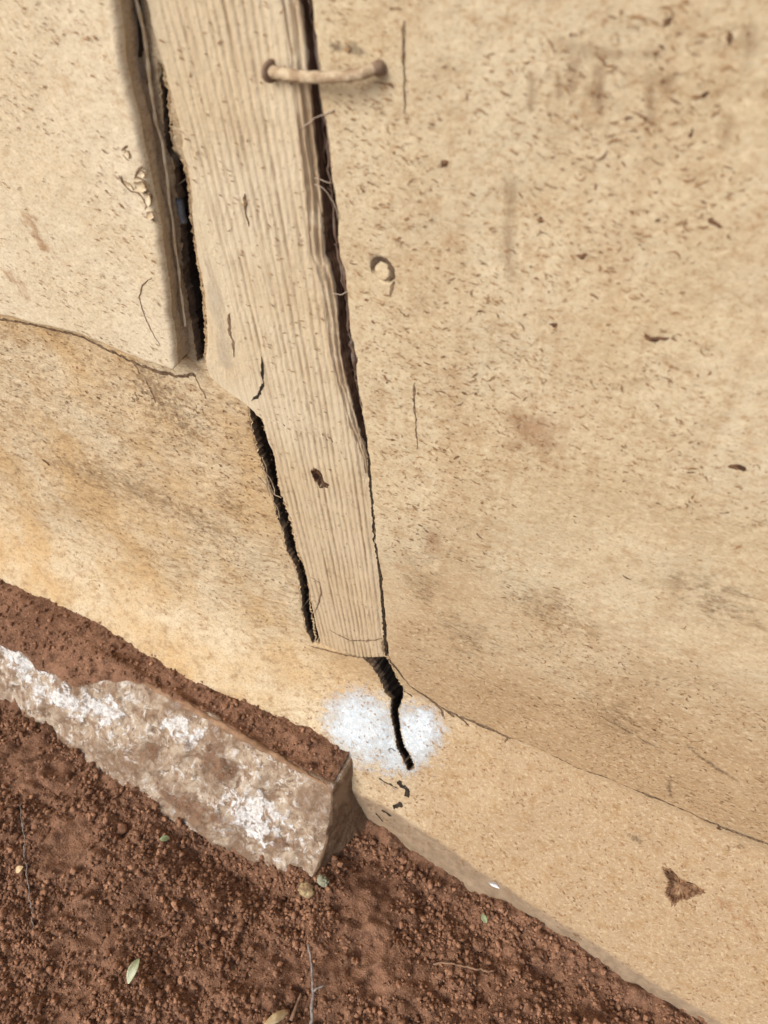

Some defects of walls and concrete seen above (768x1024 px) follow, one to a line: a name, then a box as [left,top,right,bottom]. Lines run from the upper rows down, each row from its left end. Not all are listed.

crack [249,0,768,845]